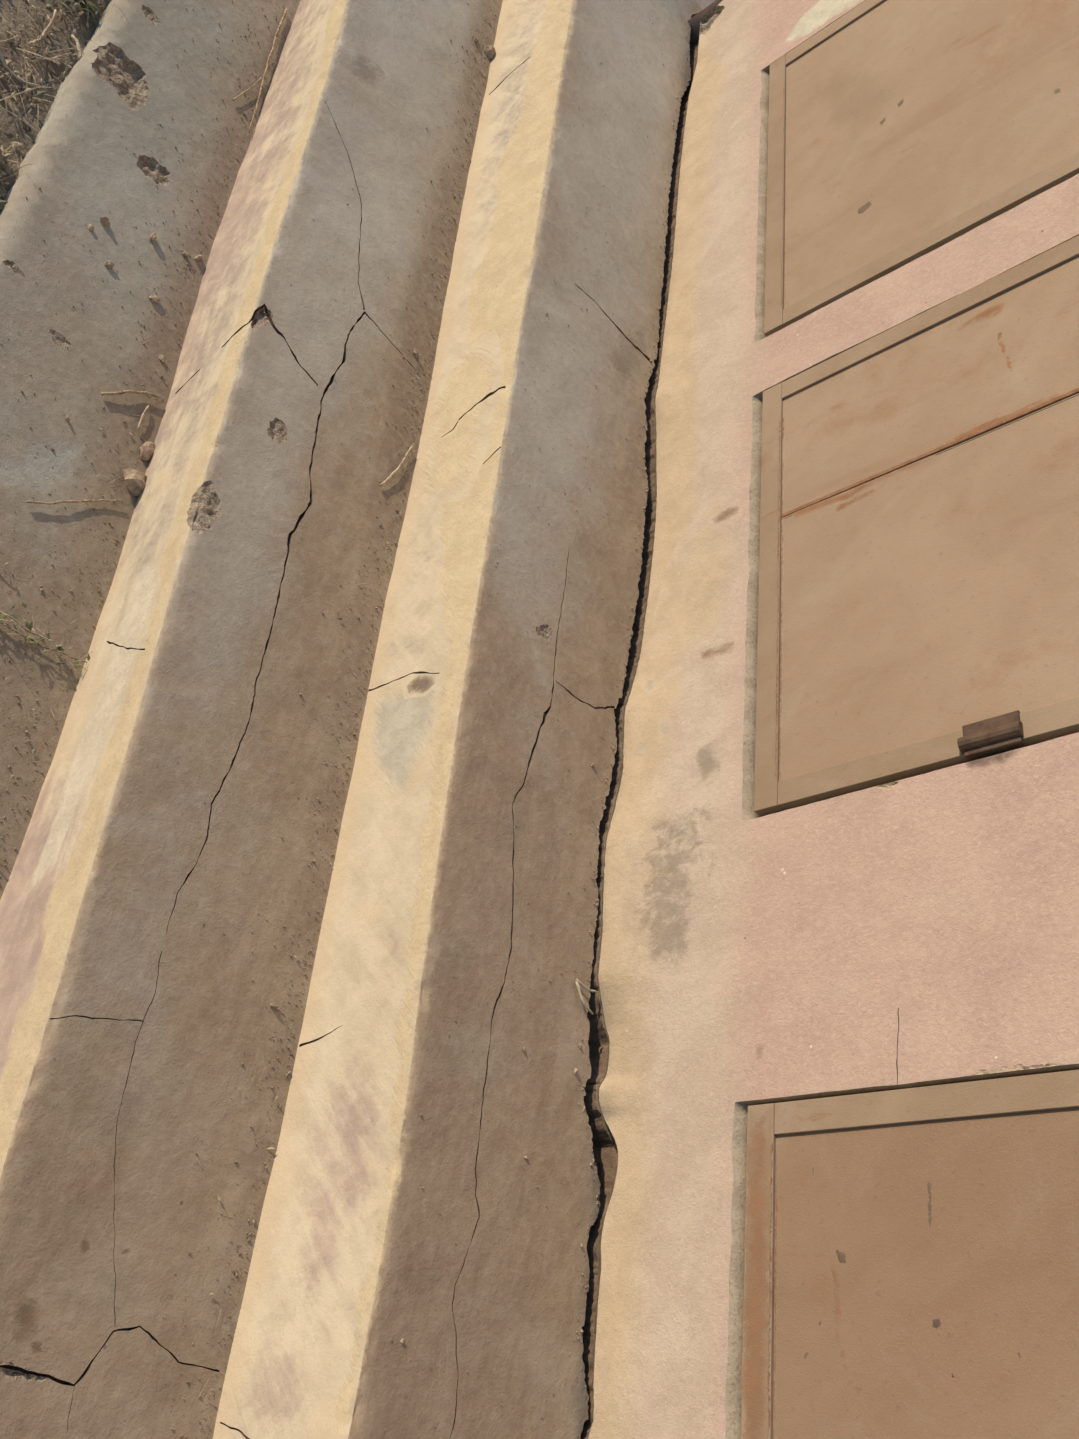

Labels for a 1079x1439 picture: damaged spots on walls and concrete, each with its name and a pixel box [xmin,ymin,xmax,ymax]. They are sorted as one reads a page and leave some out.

crack [0,101,415,1430]
crack [368,671,440,692]
crack [441,13,699,1439]
crack [220,1422,249,1439]